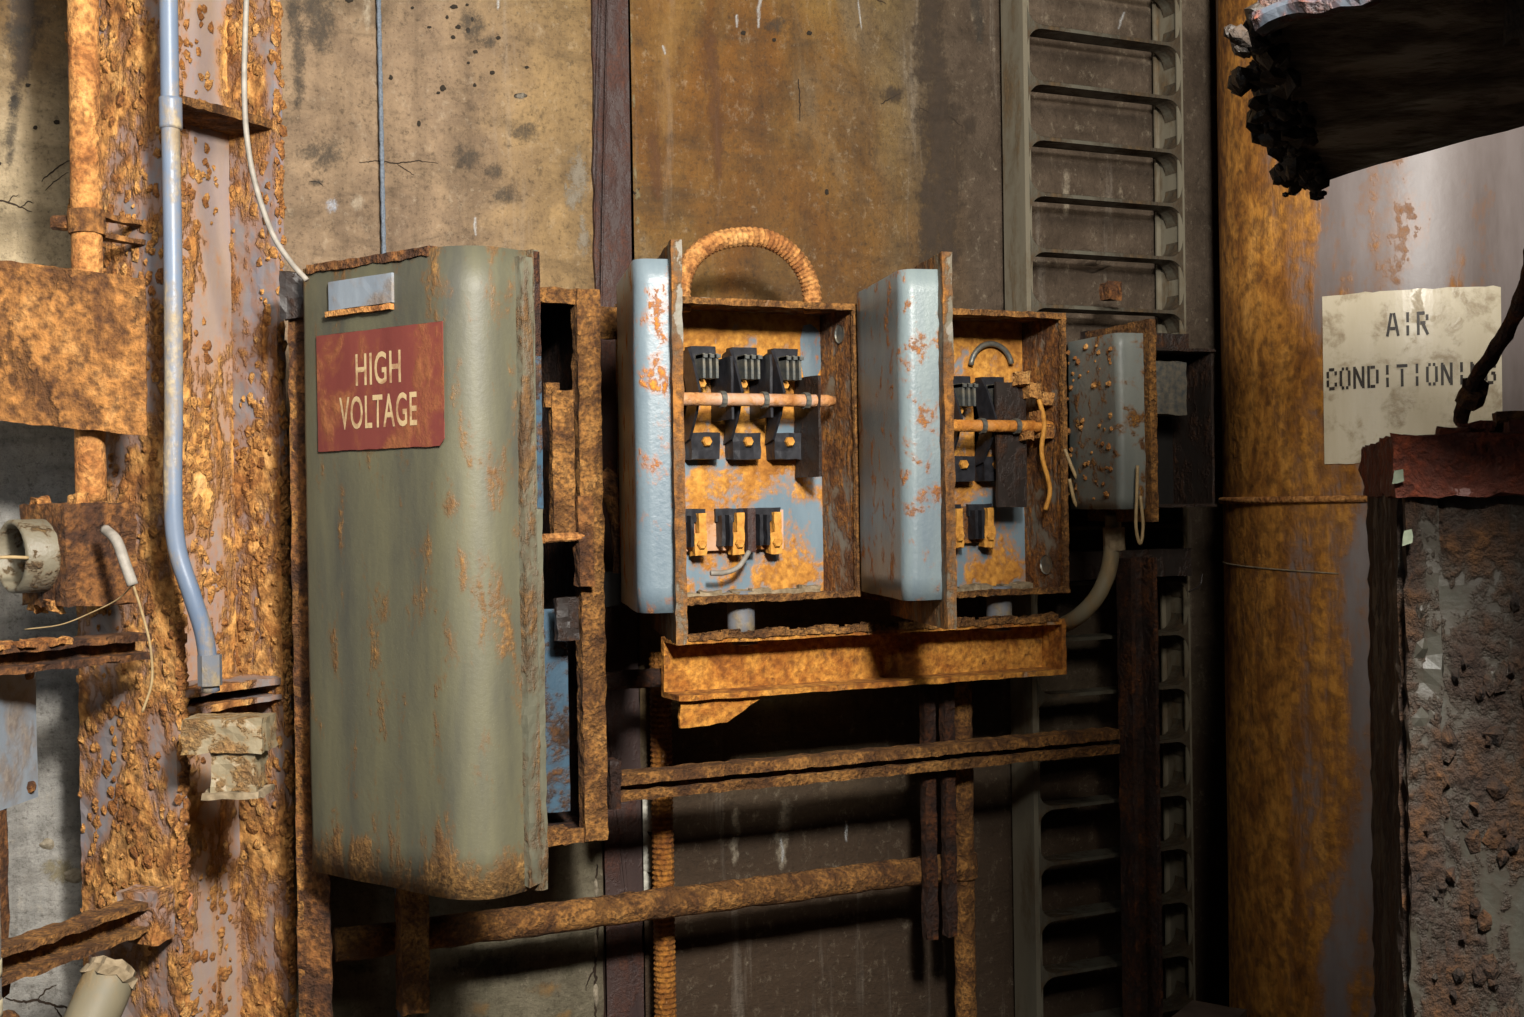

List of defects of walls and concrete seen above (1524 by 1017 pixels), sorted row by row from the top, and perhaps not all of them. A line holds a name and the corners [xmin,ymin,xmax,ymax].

water stain [7,0,43,162]
crack [0,160,70,212]
water stain [913,0,976,262]
corrosion [76,0,298,1017]